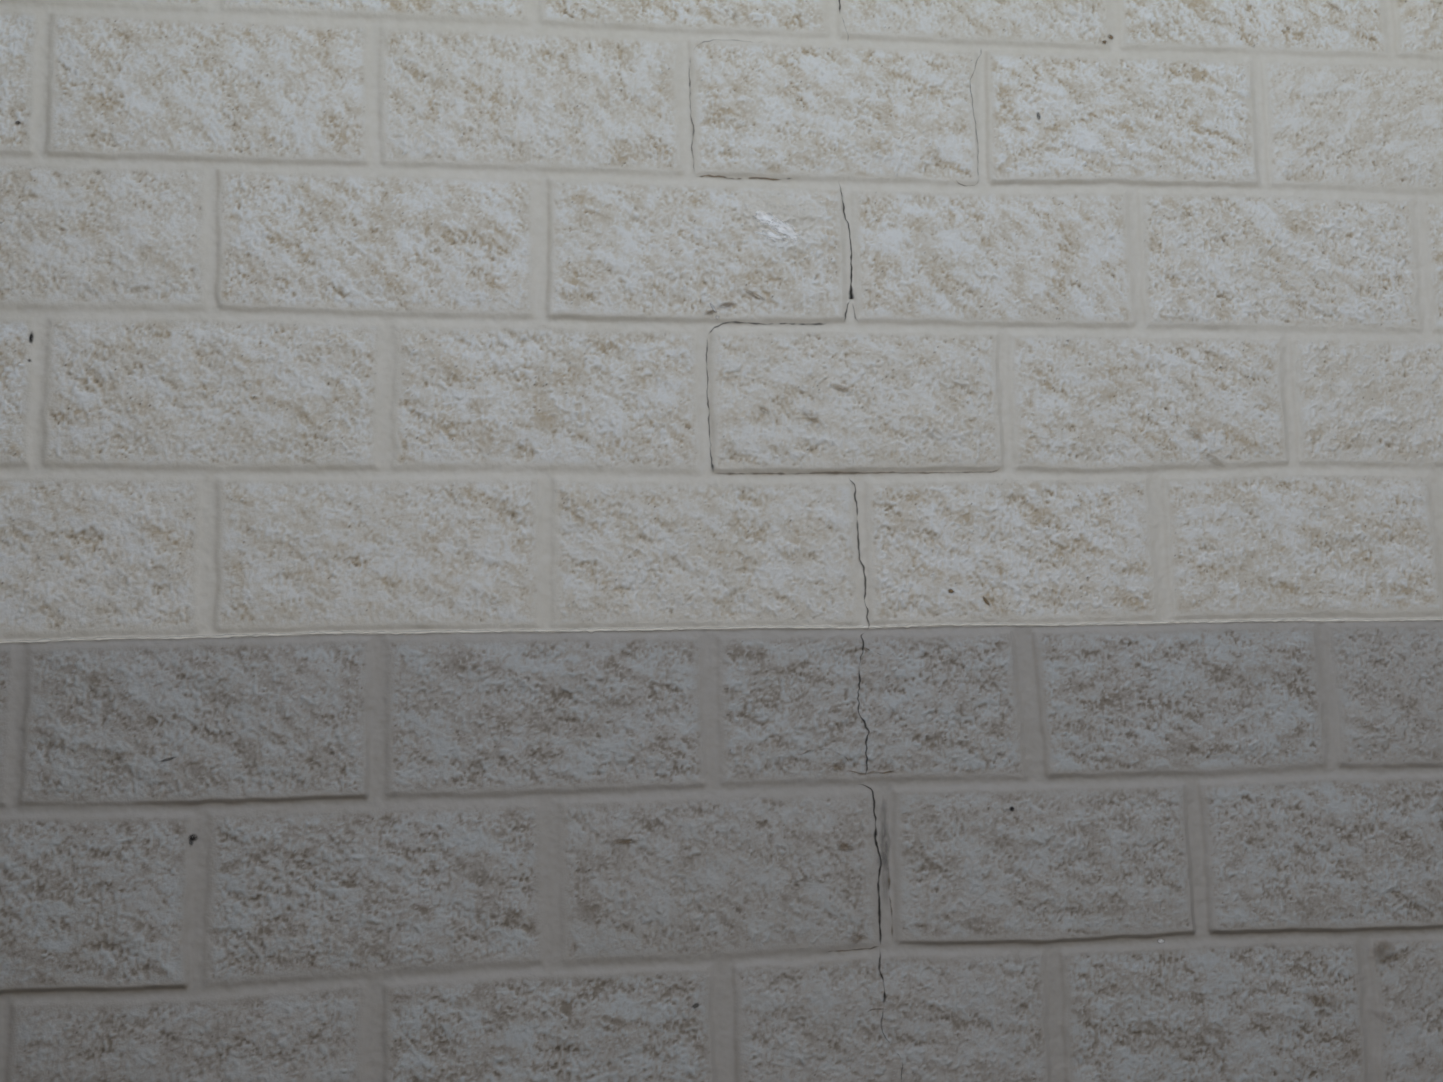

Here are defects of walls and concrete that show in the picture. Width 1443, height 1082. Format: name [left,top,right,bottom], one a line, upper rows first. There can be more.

crack [689,78,790,180]
crack [706,187,994,1078]